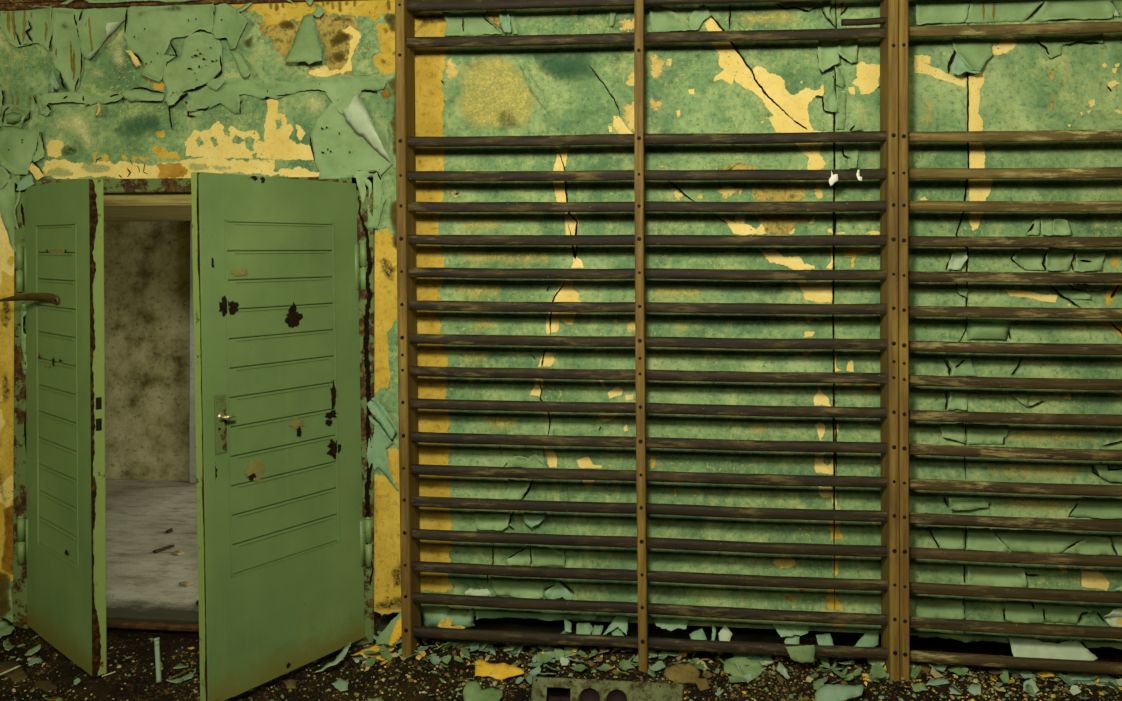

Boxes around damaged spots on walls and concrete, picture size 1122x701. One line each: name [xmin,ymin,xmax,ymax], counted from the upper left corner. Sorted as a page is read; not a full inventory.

rust [3,10,32,40]
rust [45,19,93,79]
flaking render [649,4,880,170]
peeling [914,36,1016,231]
flaking render [414,7,634,680]
crack [532,148,578,434]
crack [689,0,856,609]
flaking render [718,184,880,337]
crack [944,36,975,479]
crack [1008,331,1046,408]
crack [487,456,533,583]
peeling [654,555,845,680]